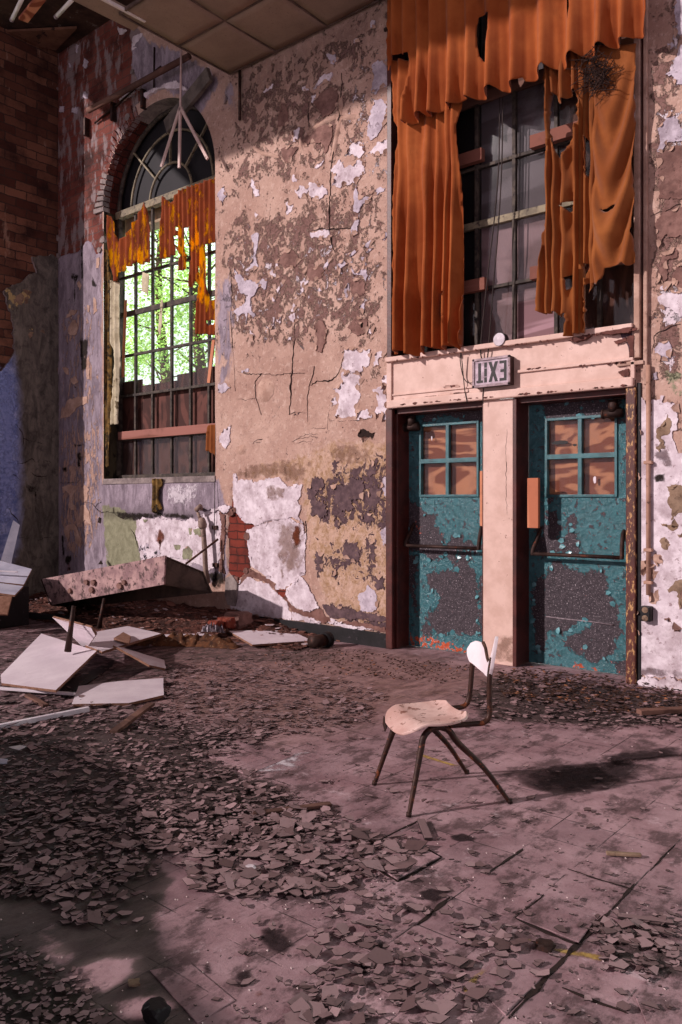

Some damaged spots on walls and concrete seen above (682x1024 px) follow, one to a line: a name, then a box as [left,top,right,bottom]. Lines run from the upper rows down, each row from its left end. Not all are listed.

peeling [665,0,682,85]
spalling [0,20,188,372]
peeling [217,186,227,205]
peeling [231,51,398,442]
crack [314,151,350,250]
peeling [653,111,682,317]
crack [230,273,370,441]
peeling [651,341,673,380]
peeling [29,457,386,650]
peeling [413,533,482,572]
peeling [541,501,582,571]
peeling [636,395,682,691]